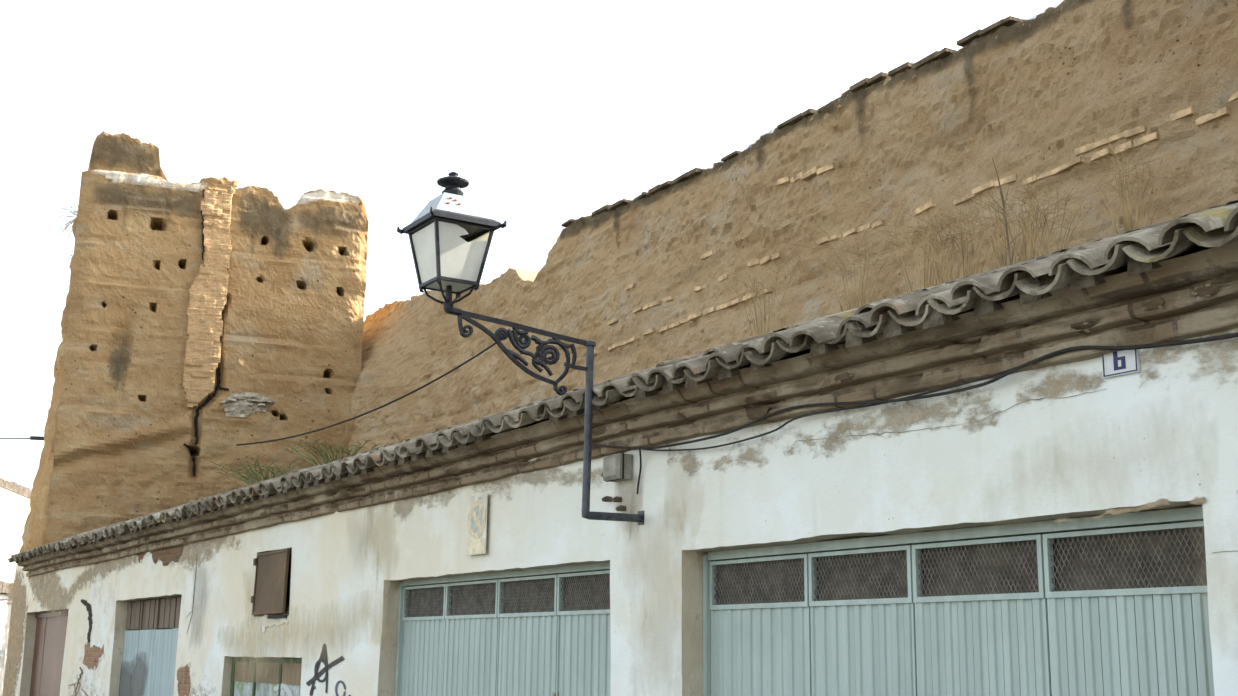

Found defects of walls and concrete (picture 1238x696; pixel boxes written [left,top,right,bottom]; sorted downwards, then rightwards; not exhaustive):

crack [199,189,207,267]
crack [183,365,229,476]
spalling [0,536,239,696]